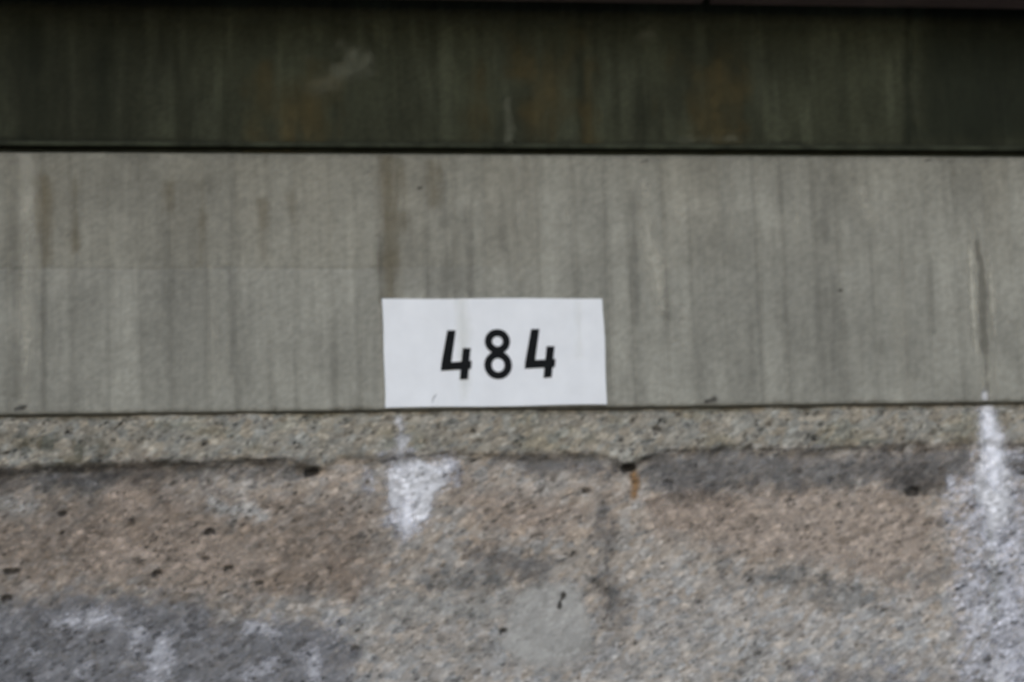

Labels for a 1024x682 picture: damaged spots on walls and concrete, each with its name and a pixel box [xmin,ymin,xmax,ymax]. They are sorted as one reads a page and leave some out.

leakage [968,247,978,353]
corrosion [630,471,640,498]
leakage [643,392,1024,682]